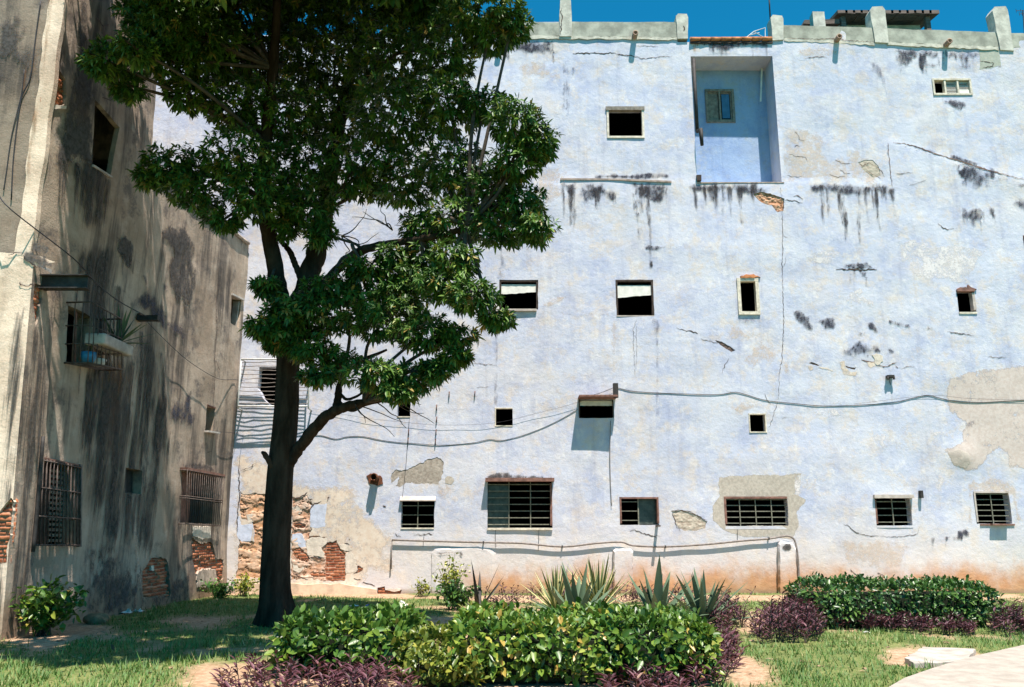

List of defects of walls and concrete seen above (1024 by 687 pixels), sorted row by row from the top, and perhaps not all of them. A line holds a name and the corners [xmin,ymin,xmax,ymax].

crack [560,11,669,59]
crack [888,142,1020,185]
mould [953,155,994,185]
leakage [692,183,762,206]
flaking render [754,192,801,212]
leakage [811,184,894,227]
leakage [162,226,196,312]
mould [794,311,834,330]
peeling [945,367,1024,470]
flaking render [367,457,454,495]
peeling [235,455,268,552]
peeling [290,483,402,594]